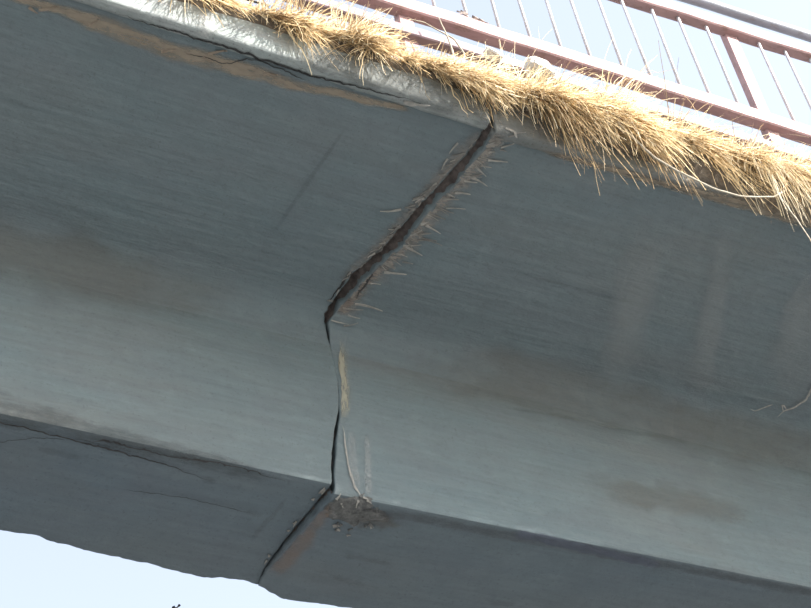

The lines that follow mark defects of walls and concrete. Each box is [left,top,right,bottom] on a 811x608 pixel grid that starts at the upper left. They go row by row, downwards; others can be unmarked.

crack [264,124,526,565]
crack [0,422,281,480]
spalling [324,493,389,537]